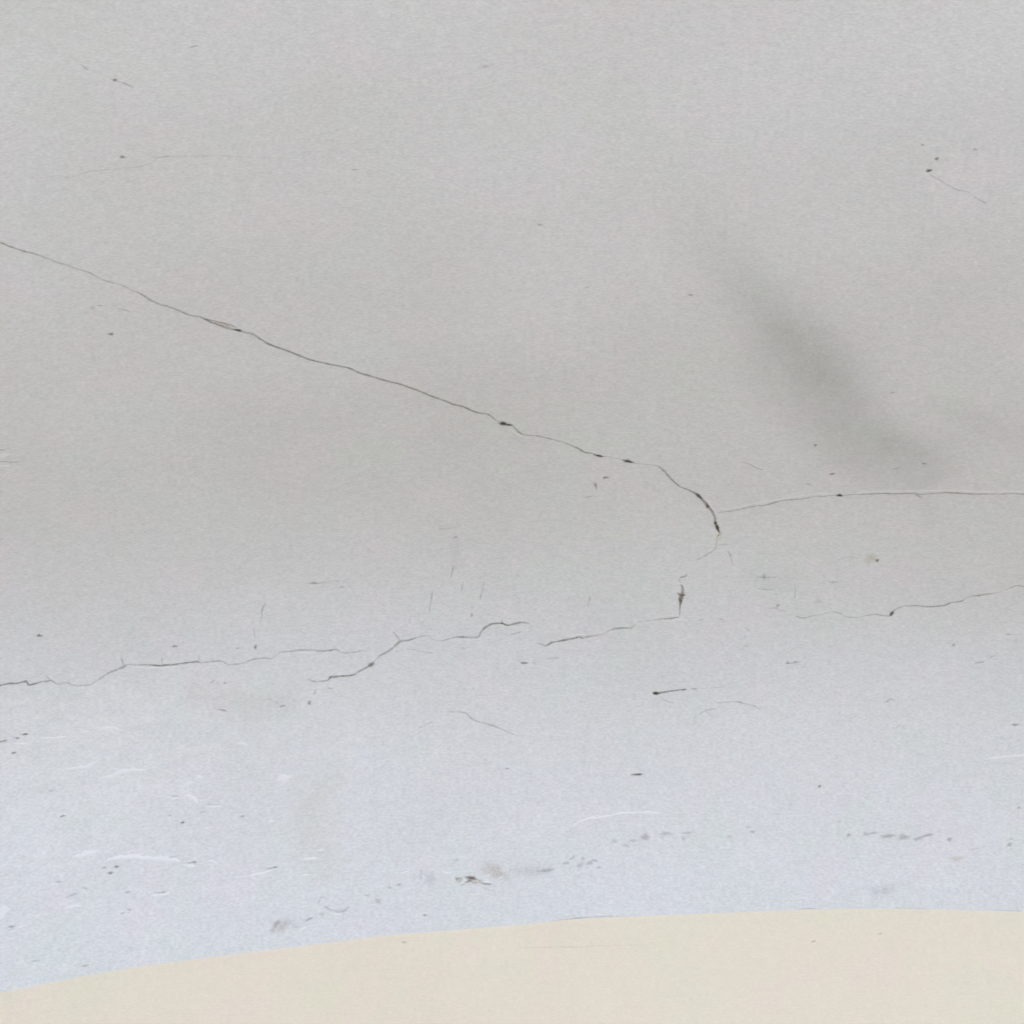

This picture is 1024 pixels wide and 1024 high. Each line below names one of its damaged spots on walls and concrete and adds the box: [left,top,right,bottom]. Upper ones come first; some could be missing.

crack [694,490,1024,531]